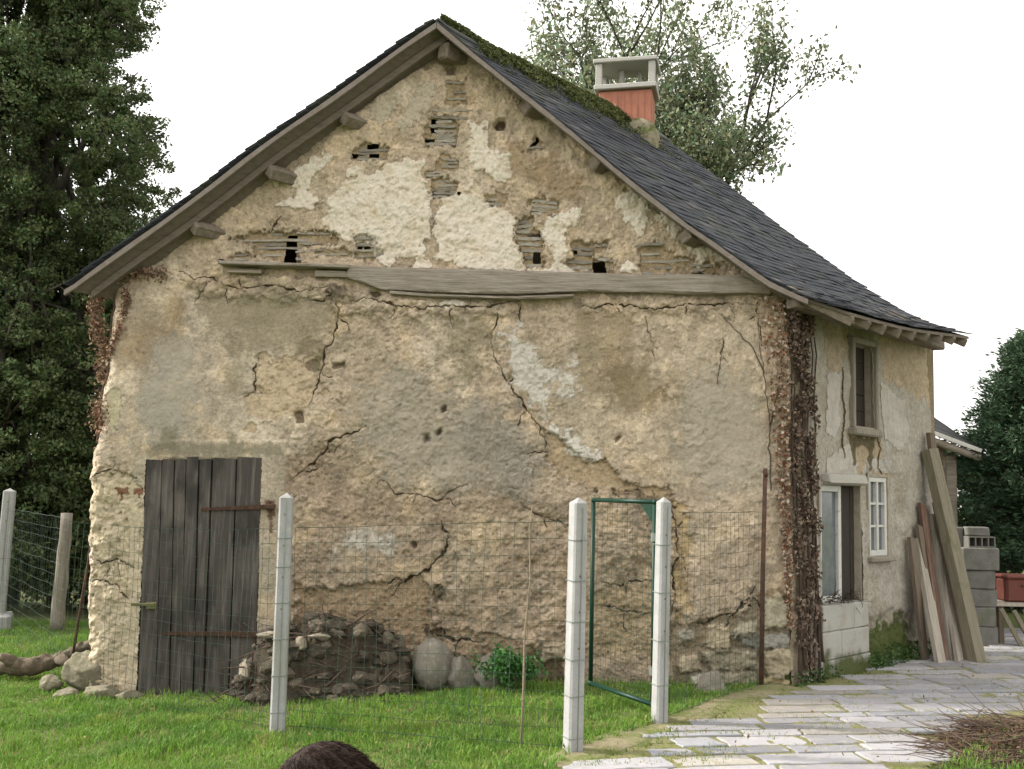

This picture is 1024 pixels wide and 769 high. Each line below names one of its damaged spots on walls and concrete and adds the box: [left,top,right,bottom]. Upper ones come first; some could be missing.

peeling [275,120,582,272]
peeling [620,260,638,274]
peeling [614,187,726,268]
corrosion [115,487,143,501]
crack [290,424,367,482]
crack [179,270,548,455]
water stain [334,527,397,562]
crack [376,478,466,597]
water stain [357,322,602,503]
crack [520,502,569,528]
crack [600,503,760,631]
peeling [822,320,930,479]